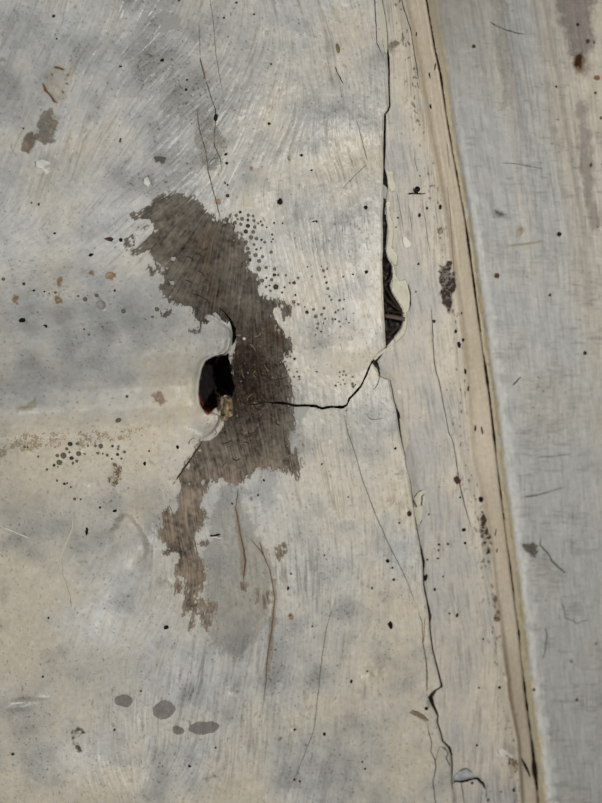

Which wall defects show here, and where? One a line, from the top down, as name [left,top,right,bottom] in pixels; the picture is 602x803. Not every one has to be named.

water stain [123,191,304,632]
crack [252,0,487,803]
crack [426,0,515,598]
crack [517,620,539,803]